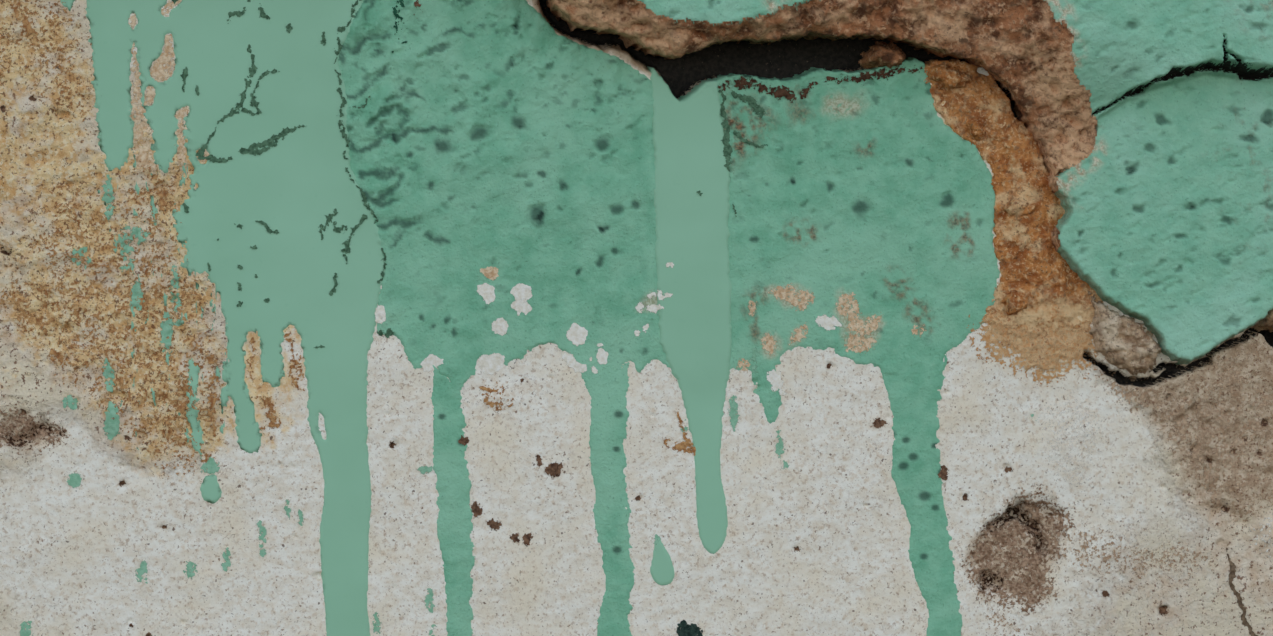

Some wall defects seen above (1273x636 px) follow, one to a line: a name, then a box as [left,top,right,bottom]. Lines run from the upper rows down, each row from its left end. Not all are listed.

peeling [130,34,176,173]
crack [1092,35,1273,115]
peeling [174,106,210,175]
spalling [544,0,1108,387]
peeling [477,266,532,336]
peeling [420,354,444,372]
peeling [477,353,505,375]
peeling [766,369,787,395]
spalling [1,409,66,449]